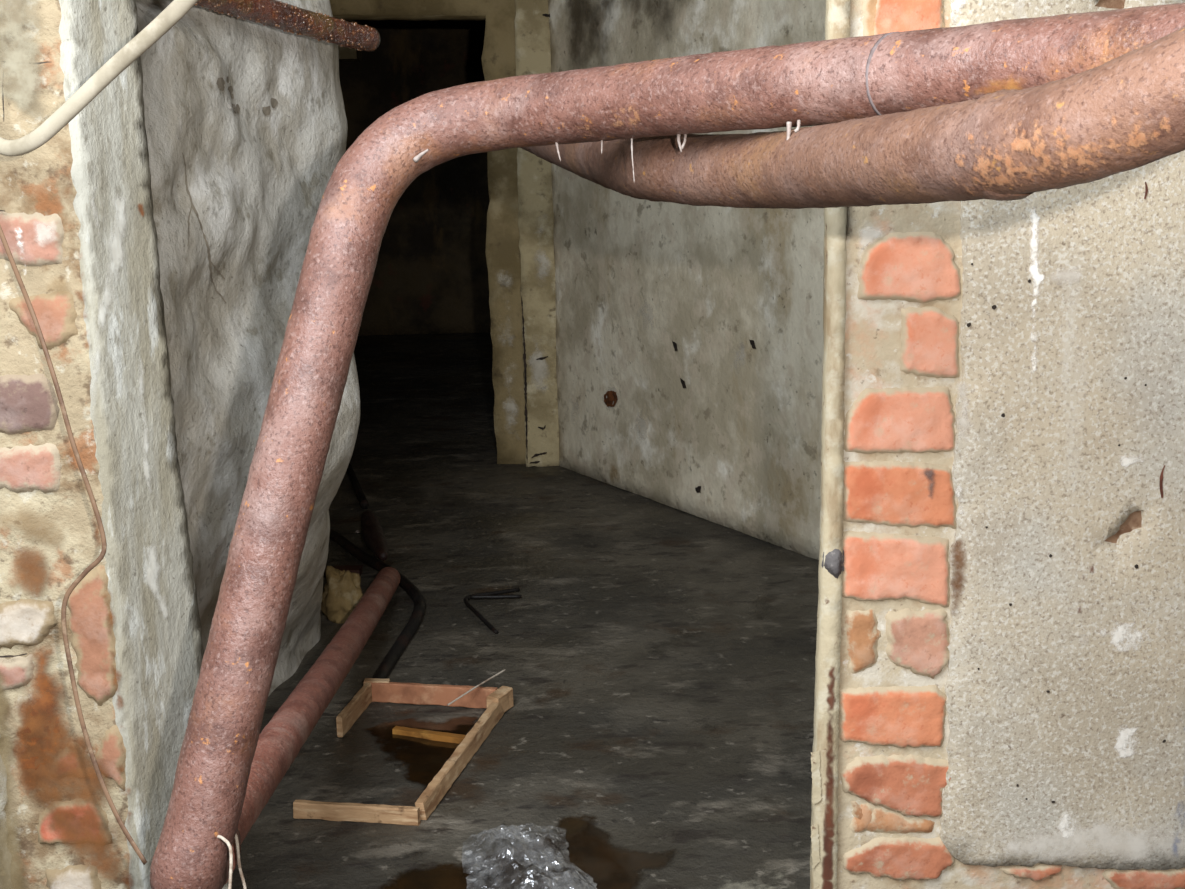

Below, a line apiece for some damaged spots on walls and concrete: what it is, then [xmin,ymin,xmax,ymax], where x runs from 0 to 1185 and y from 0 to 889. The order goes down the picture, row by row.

flaking render [0,0,66,140]
flaking render [850,0,952,37]
flaking render [0,123,130,889]
flaking render [837,201,1185,889]
peeling [811,823,820,869]
peeling [811,750,822,806]
corrosion [822,668,835,889]